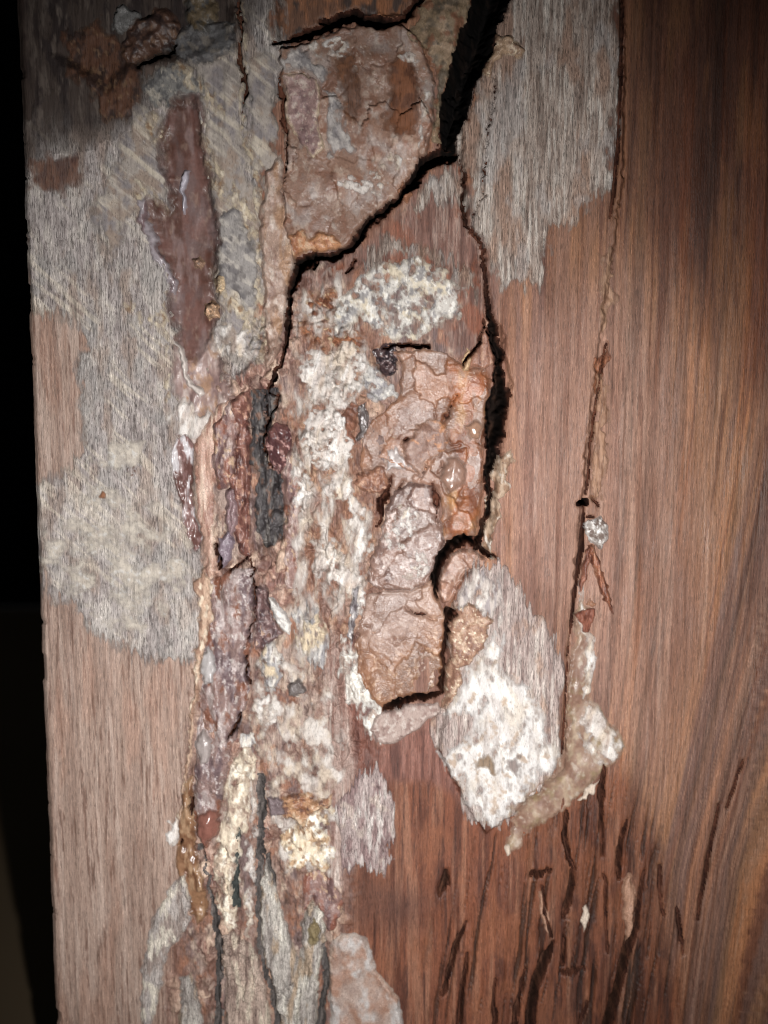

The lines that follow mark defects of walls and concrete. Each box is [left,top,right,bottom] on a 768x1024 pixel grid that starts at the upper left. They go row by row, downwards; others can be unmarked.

crack [272,0,425,45]
crack [262,148,512,711]
spalling [171,434,203,551]
peeling [214,488,238,570]
spalling [375,475,400,528]
crack [561,343,607,754]
peeling [288,678,306,697]
damp [575,582,596,696]
peeling [302,869,403,1024]